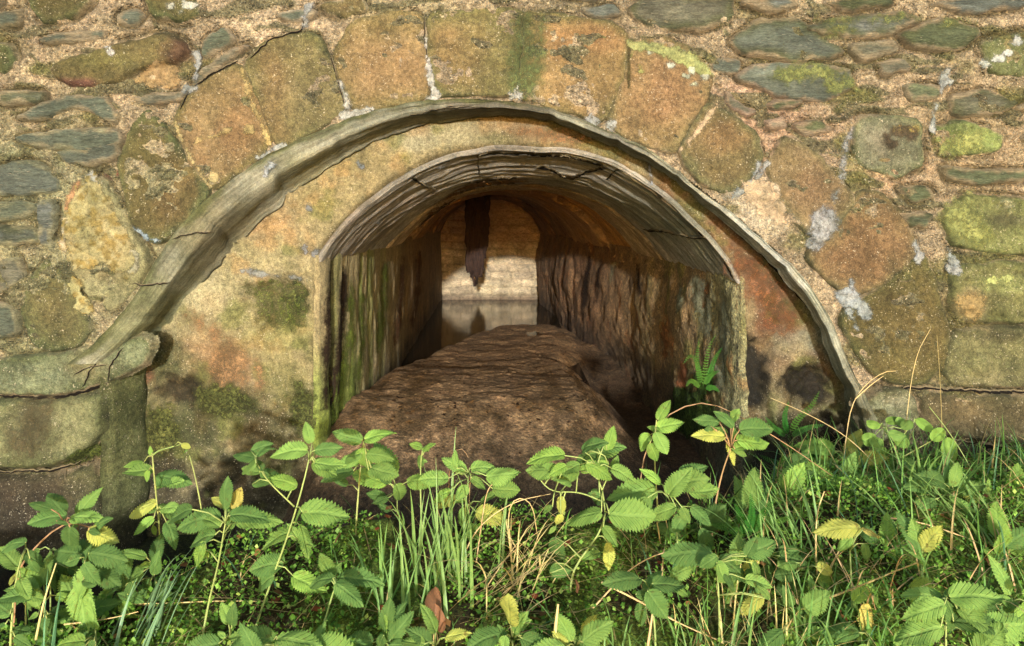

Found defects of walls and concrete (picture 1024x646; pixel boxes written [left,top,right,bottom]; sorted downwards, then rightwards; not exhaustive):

crack [174,18,304,188]
crack [411,151,623,228]
leakage [805,128,853,251]
crack [171,231,211,240]
crack [643,193,806,306]
leakage [946,250,961,276]
leakage [836,278,873,329]
crack [0,348,123,400]